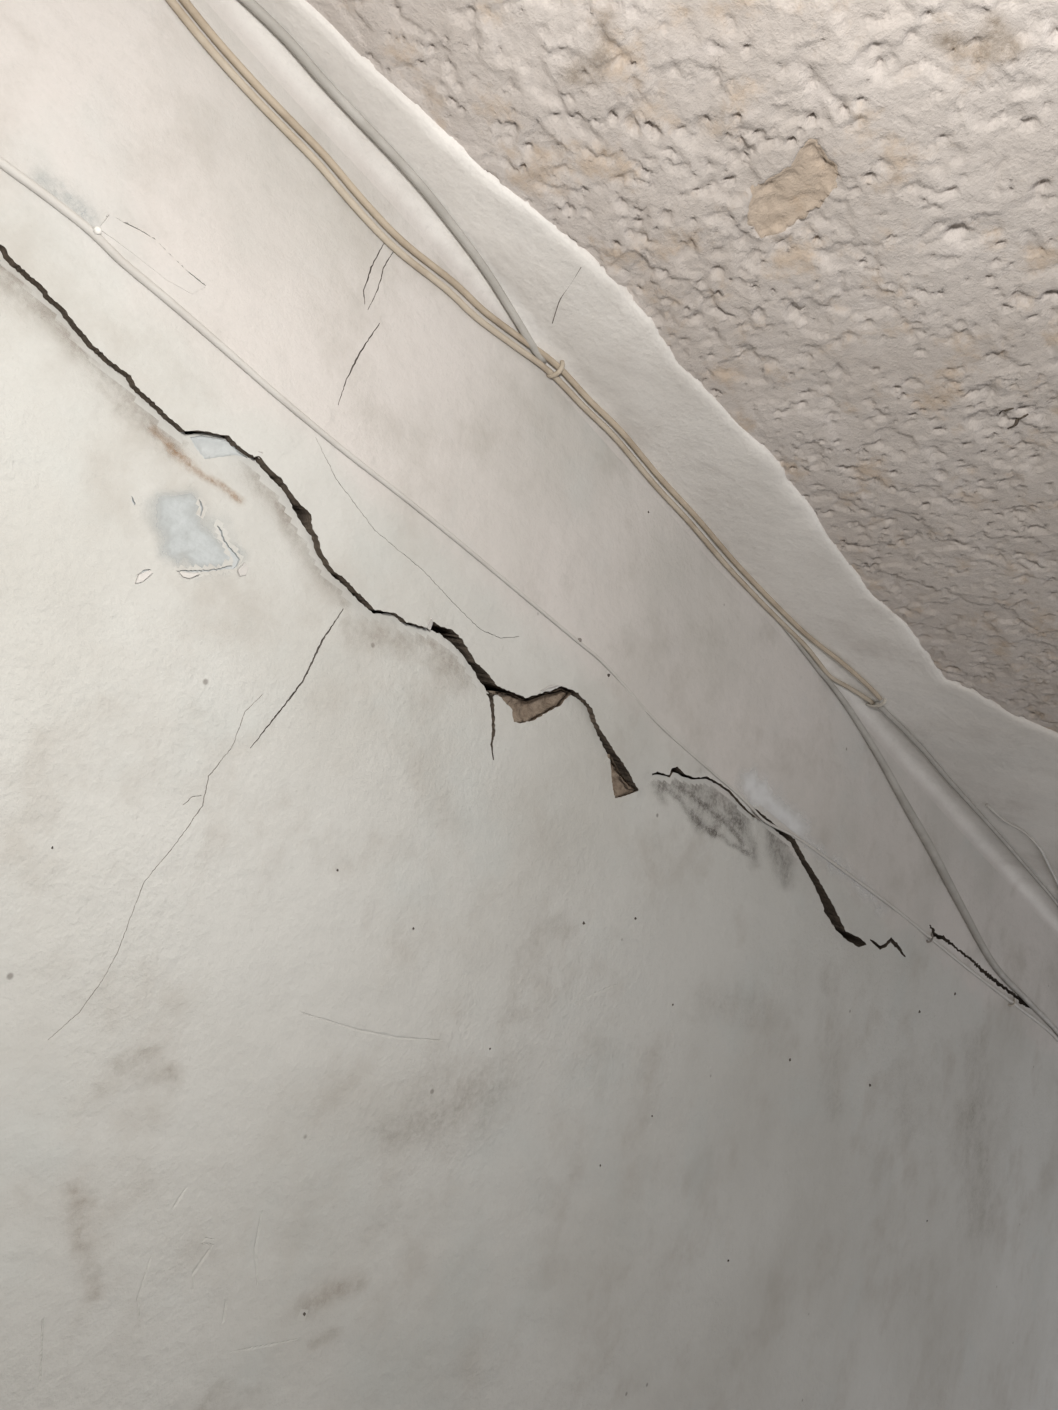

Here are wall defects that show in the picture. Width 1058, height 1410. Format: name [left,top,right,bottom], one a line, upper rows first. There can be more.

crack [0,244,1031,1040]